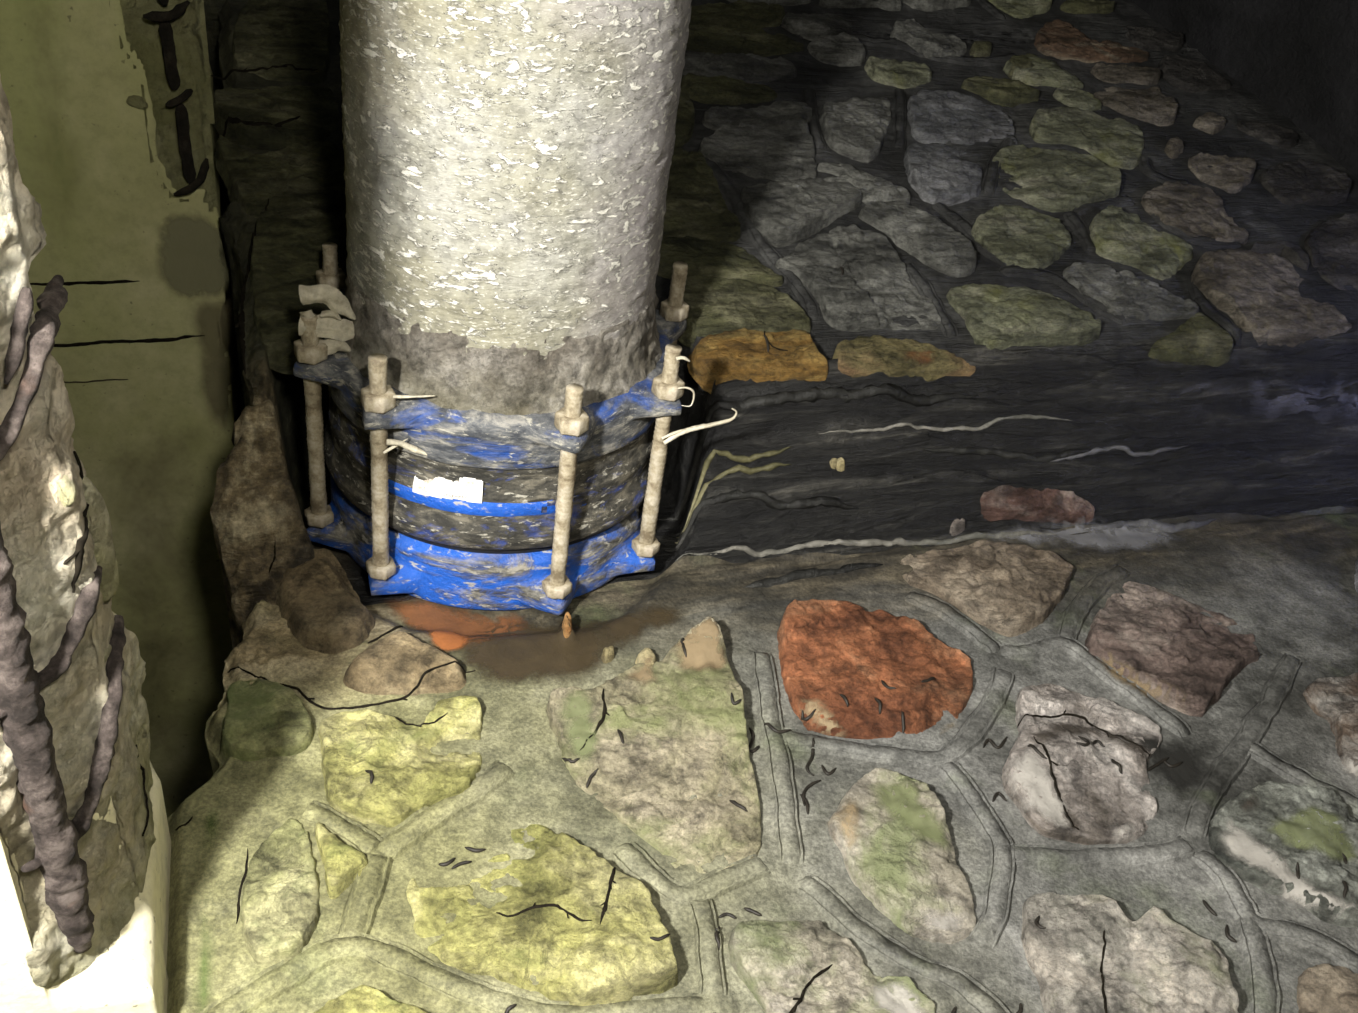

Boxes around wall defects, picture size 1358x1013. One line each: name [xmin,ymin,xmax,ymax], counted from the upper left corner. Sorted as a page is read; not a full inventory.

crack [30,279,138,287]
crack [235,199,269,374]
crack [54,335,203,347]
crack [64,377,128,385]
crack [63,451,89,593]
crack [368,626,403,643]
corrosion [394,603,520,650]
leakage [466,608,677,682]
leakage [679,618,725,670]
crack [227,661,475,727]
crack [1017,710,1150,830]
crack [496,867,616,924]